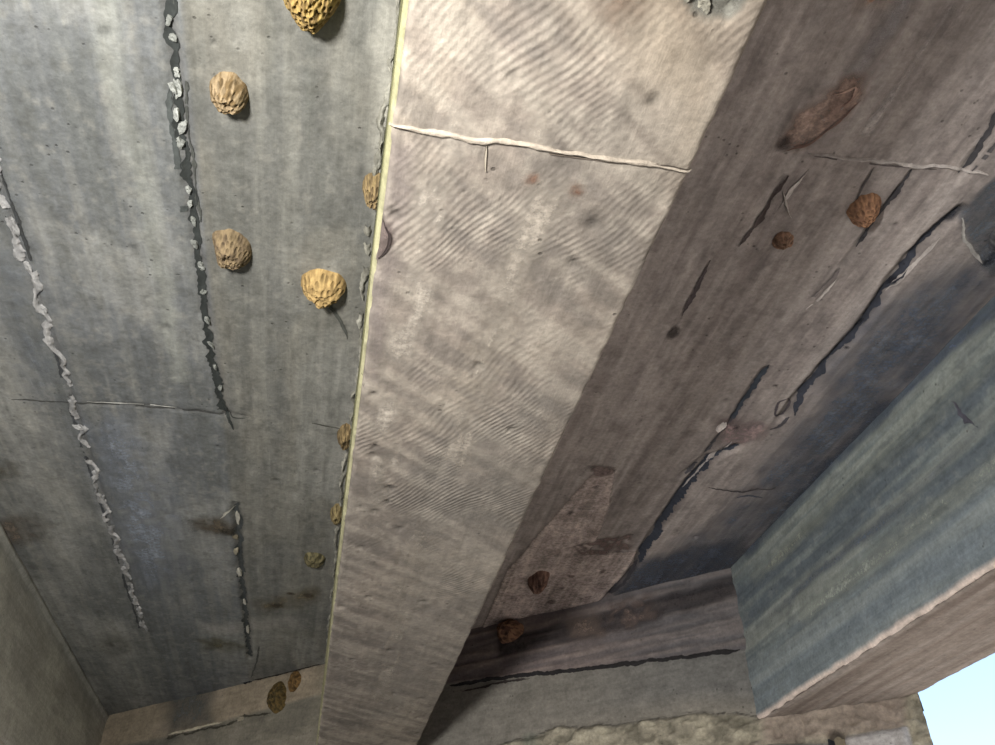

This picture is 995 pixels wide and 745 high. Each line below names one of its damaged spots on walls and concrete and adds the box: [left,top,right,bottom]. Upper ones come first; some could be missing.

crack [389,122,692,173]
crack [739,112,995,247]
crack [0,0,243,632]
crack [682,260,711,316]
crack [770,205,960,430]
crack [609,365,774,593]
crack [220,502,319,684]
crack [450,649,740,692]